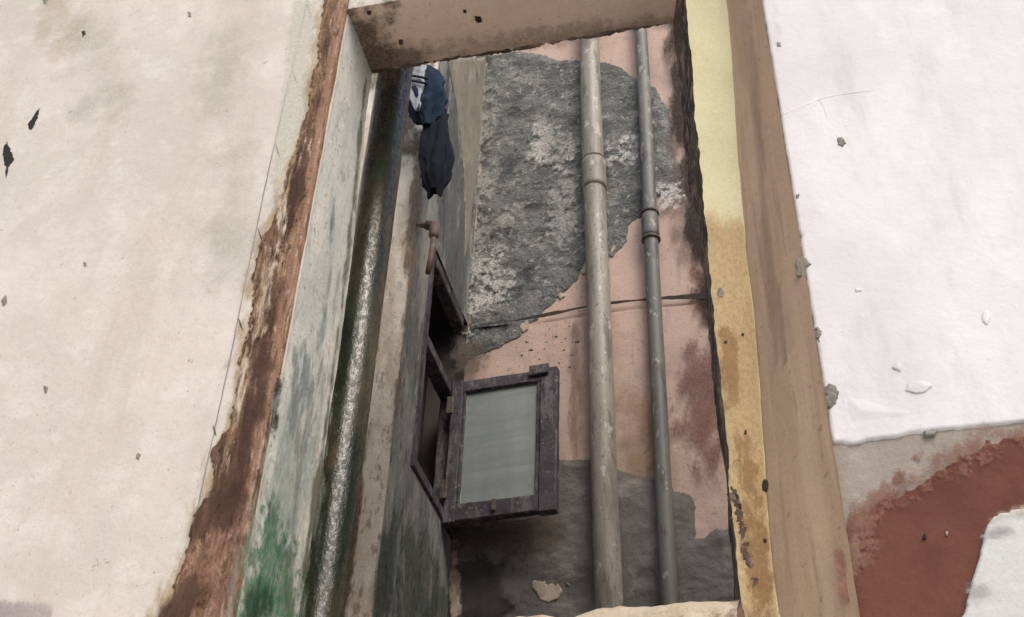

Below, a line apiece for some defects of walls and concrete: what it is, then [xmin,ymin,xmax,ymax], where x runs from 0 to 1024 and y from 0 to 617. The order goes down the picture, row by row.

peeling [3,142,14,178]
flaking render [375,24,663,368]
flaking render [600,62,684,258]
water stain [656,23,708,319]
corrosion [346,477,364,601]
flaking render [448,459,595,617]
flaking render [617,469,661,607]
flaking render [672,475,772,617]
peeling [834,426,1024,617]